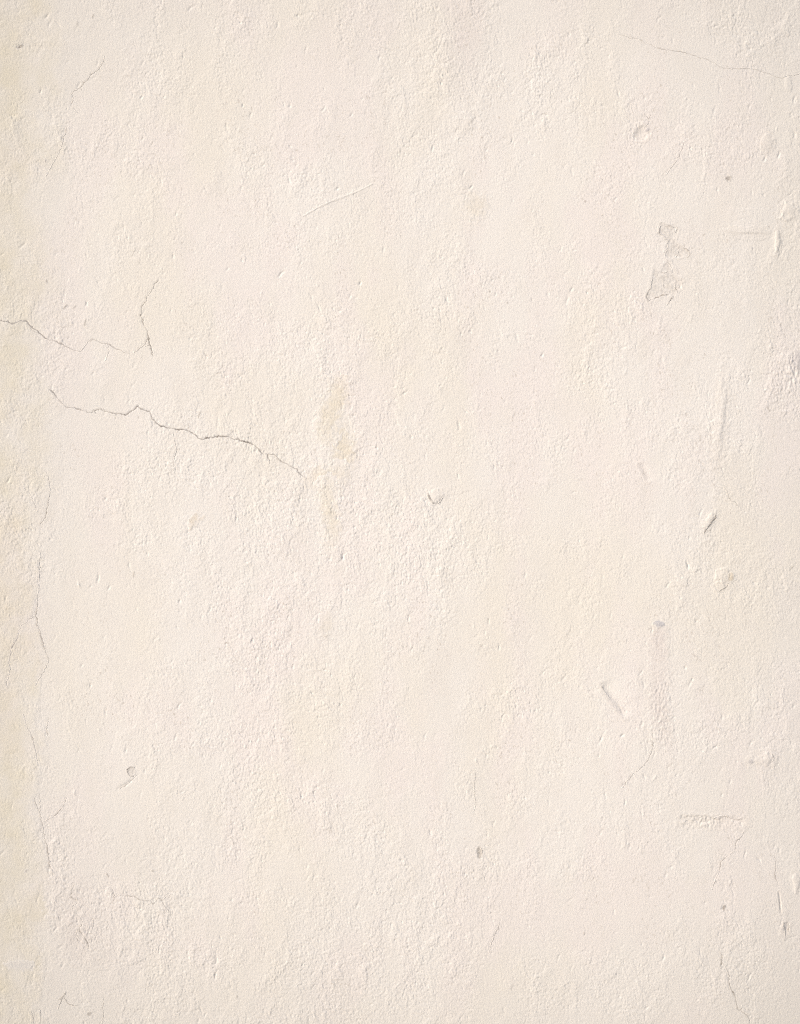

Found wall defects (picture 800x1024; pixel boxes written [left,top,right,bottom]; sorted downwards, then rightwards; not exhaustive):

flaking render [643,221,692,305]
crack [0,280,158,361]
crack [49,389,307,478]